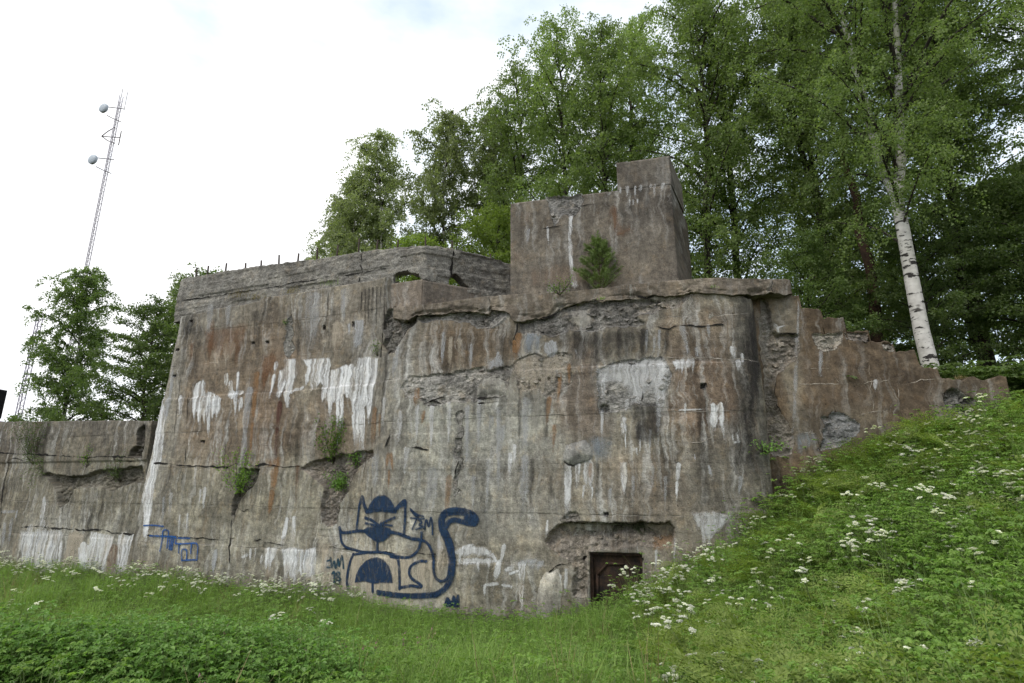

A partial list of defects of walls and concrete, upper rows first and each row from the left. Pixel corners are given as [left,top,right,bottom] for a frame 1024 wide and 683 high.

spalling [41,424,146,508]
damp [21,371,243,572]
crack [0,383,299,563]
corrosion [268,401,282,512]
damp [270,357,378,445]
spalling [379,308,507,358]
spalling [400,352,573,497]
damp [621,403,660,445]
spalling [746,297,868,457]
spalling [943,388,977,415]